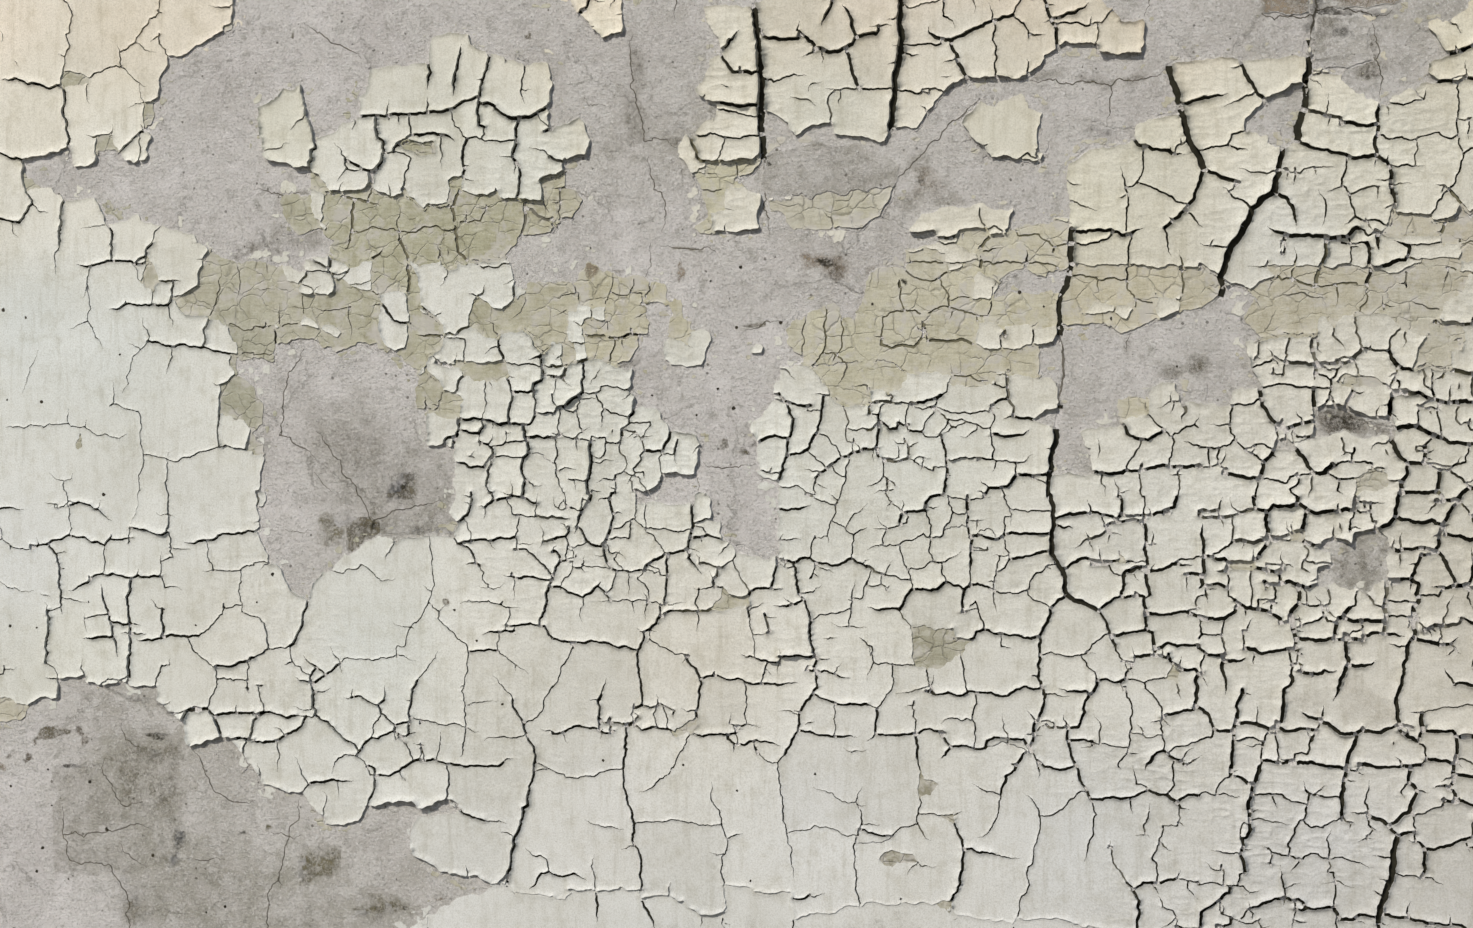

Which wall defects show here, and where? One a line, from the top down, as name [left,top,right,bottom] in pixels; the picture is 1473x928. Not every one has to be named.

crack [0,193,157,349]
crack [1,0,168,151]
crack [110,46,567,430]
peeling [0,0,1473,705]
crack [629,0,1110,229]
crack [875,235,996,350]
crack [978,208,1057,268]
crack [1016,60,1333,409]
crack [1262,0,1333,46]
crack [1267,7,1473,304]
peeling [0,338,1417,928]
peeling [1398,554,1473,739]